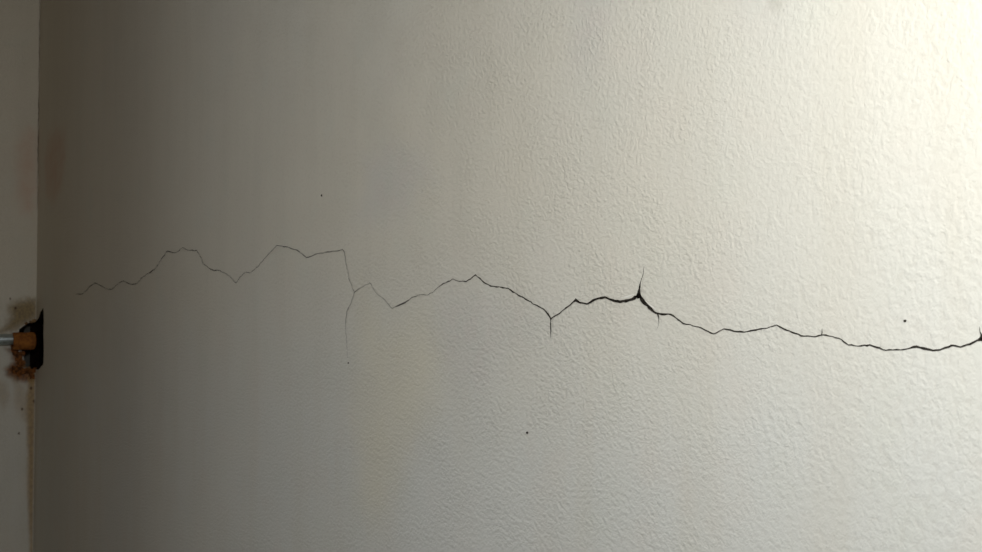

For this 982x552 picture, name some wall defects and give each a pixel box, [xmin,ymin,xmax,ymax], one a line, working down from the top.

crack [75,245,982,356]